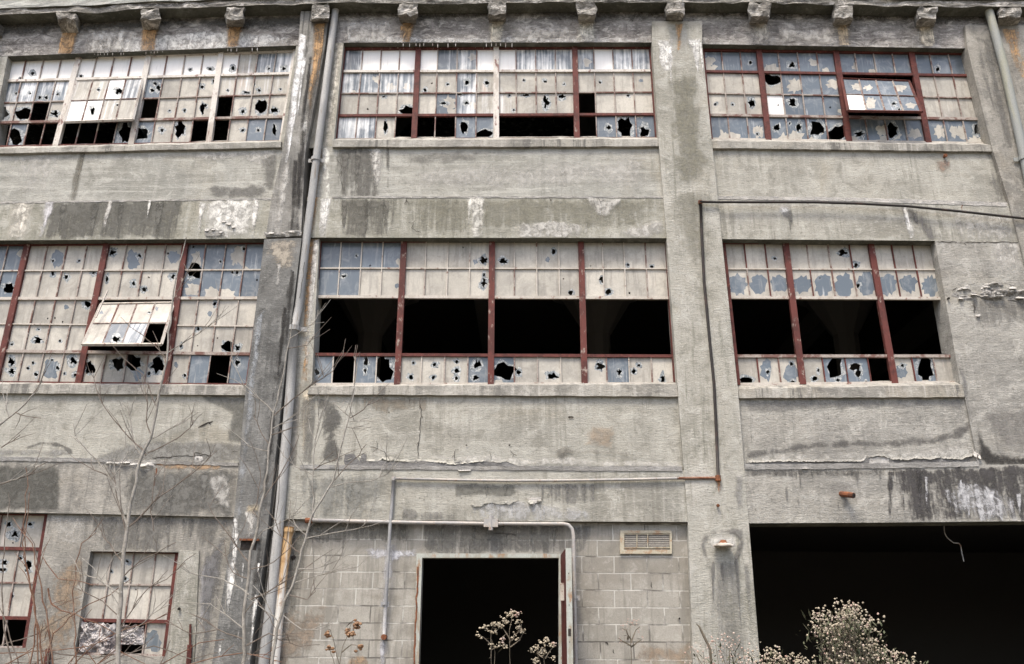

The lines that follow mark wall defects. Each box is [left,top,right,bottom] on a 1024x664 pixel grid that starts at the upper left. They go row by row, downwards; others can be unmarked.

rust [59,33,76,53]
rust [228,27,241,47]
rust [309,23,325,99]
water stain [44,153,182,239]
water stain [198,34,321,376]
water stain [309,22,565,315]
water stain [520,221,580,237]
water stain [303,390,340,462]
peeling [344,453,552,471]
water stain [735,426,969,513]
peeling [746,448,981,469]
efflorescence [947,480,1021,521]